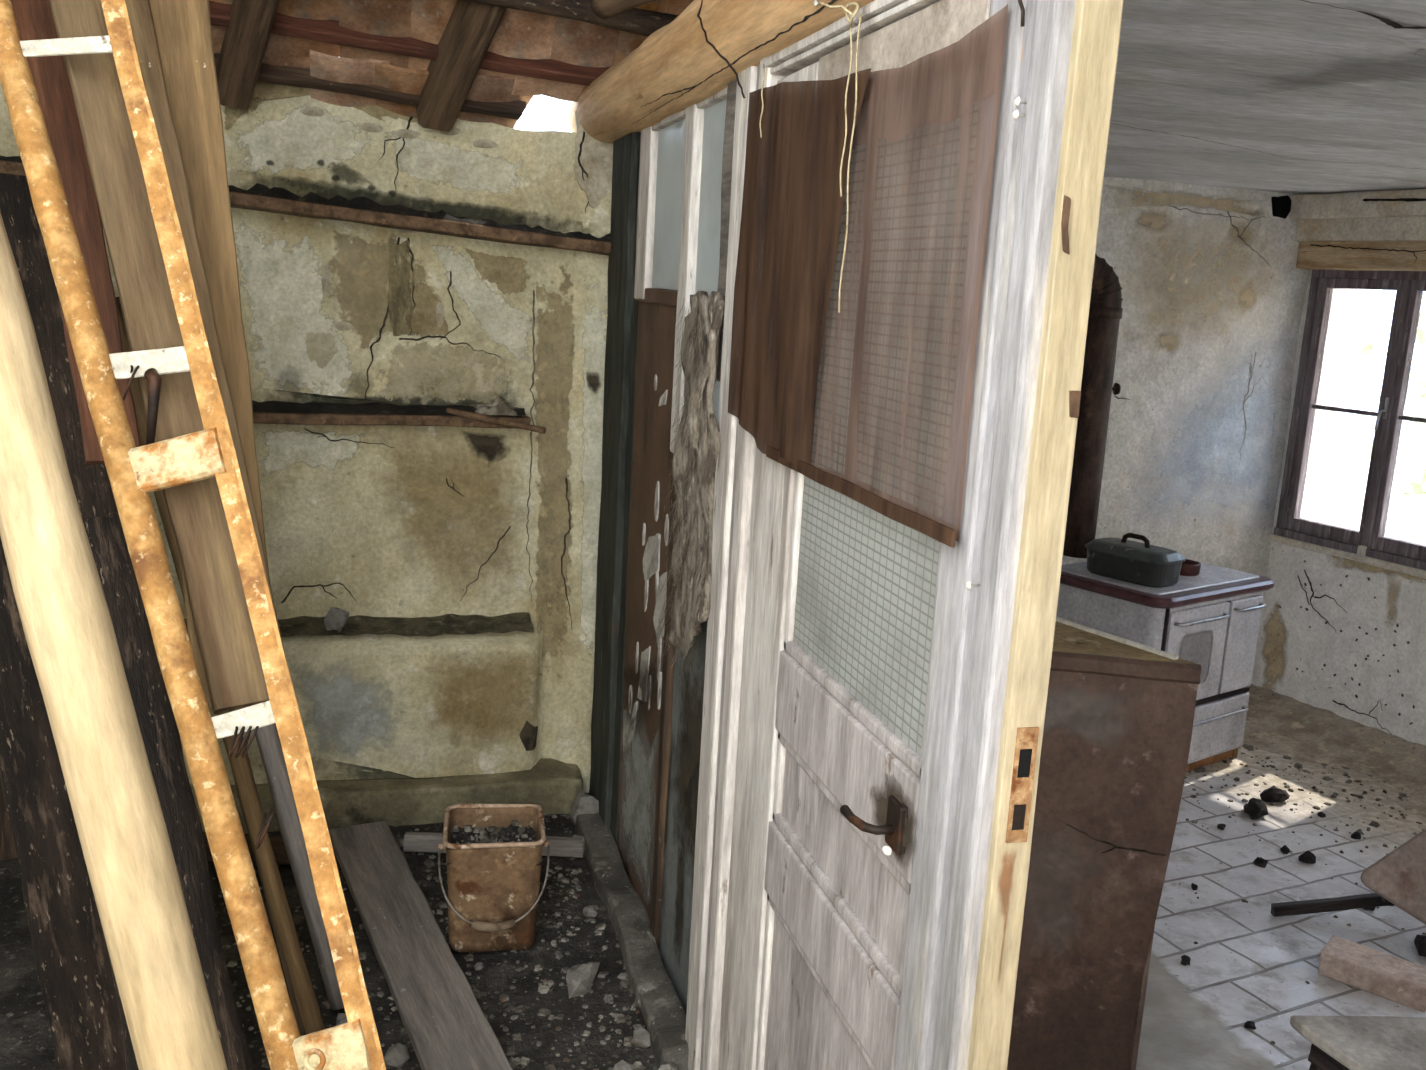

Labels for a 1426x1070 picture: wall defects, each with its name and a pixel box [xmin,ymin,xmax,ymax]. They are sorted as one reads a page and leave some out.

crack [1300,0,1426,29]
peeling [225,81,325,130]
peeling [352,105,420,139]
peeling [438,127,498,148]
peeling [574,111,613,208]
crack [364,237,572,628]
crack [281,583,356,603]
peeling [623,481,669,752]
flaking render [1263,605,1303,689]
crack [1297,569,1346,631]